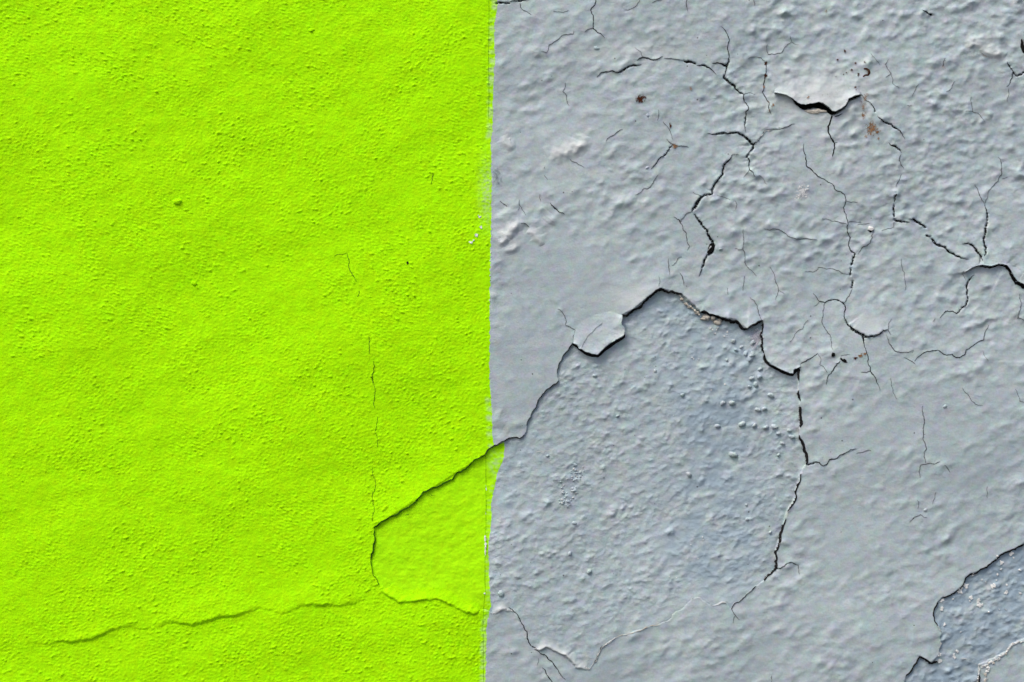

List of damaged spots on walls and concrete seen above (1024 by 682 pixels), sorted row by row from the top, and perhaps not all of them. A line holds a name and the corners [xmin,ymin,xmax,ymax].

crack [488,0,605,53]
crack [484,34,492,119]
peeling [774,72,861,157]
crack [597,27,1007,399]
spalling [370,288,808,670]
crack [807,449,867,466]
crack [919,406,950,473]
spalling [905,544,1024,682]